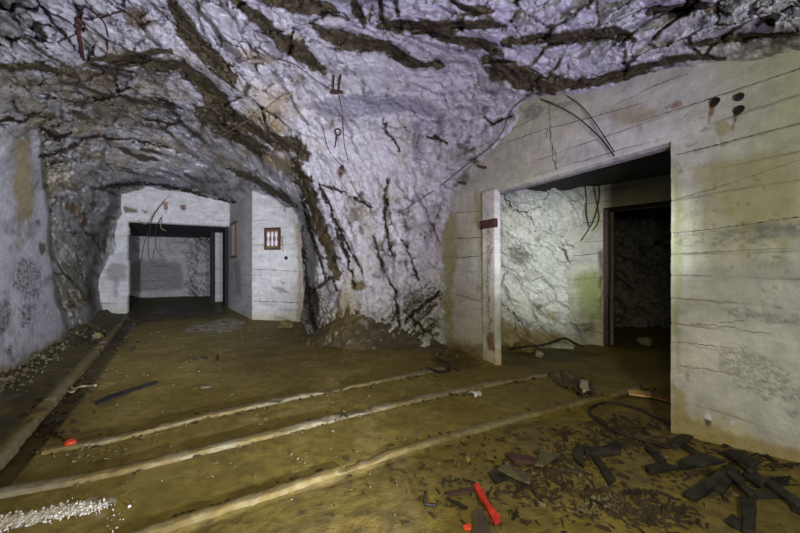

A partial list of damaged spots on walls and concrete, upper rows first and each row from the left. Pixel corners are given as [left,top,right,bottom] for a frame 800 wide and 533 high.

crack [500,68,800,170]
crack [677,320,769,349]